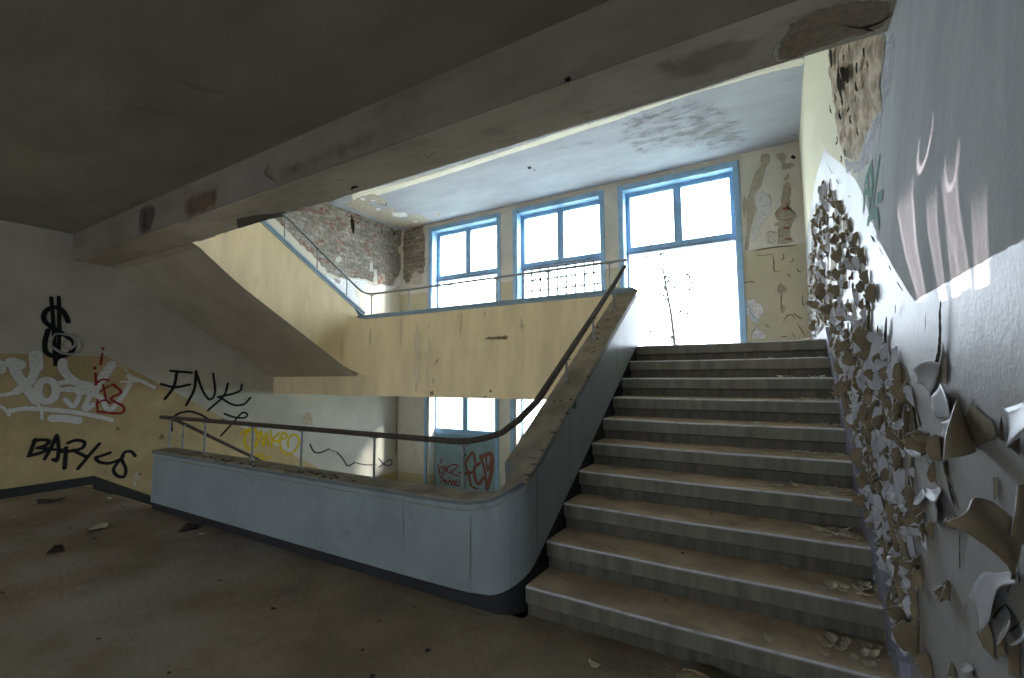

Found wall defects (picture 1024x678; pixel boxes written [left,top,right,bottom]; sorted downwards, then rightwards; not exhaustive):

damp [633,103,744,150]
flaking render [274,140,537,305]
peeling [562,0,1024,678]